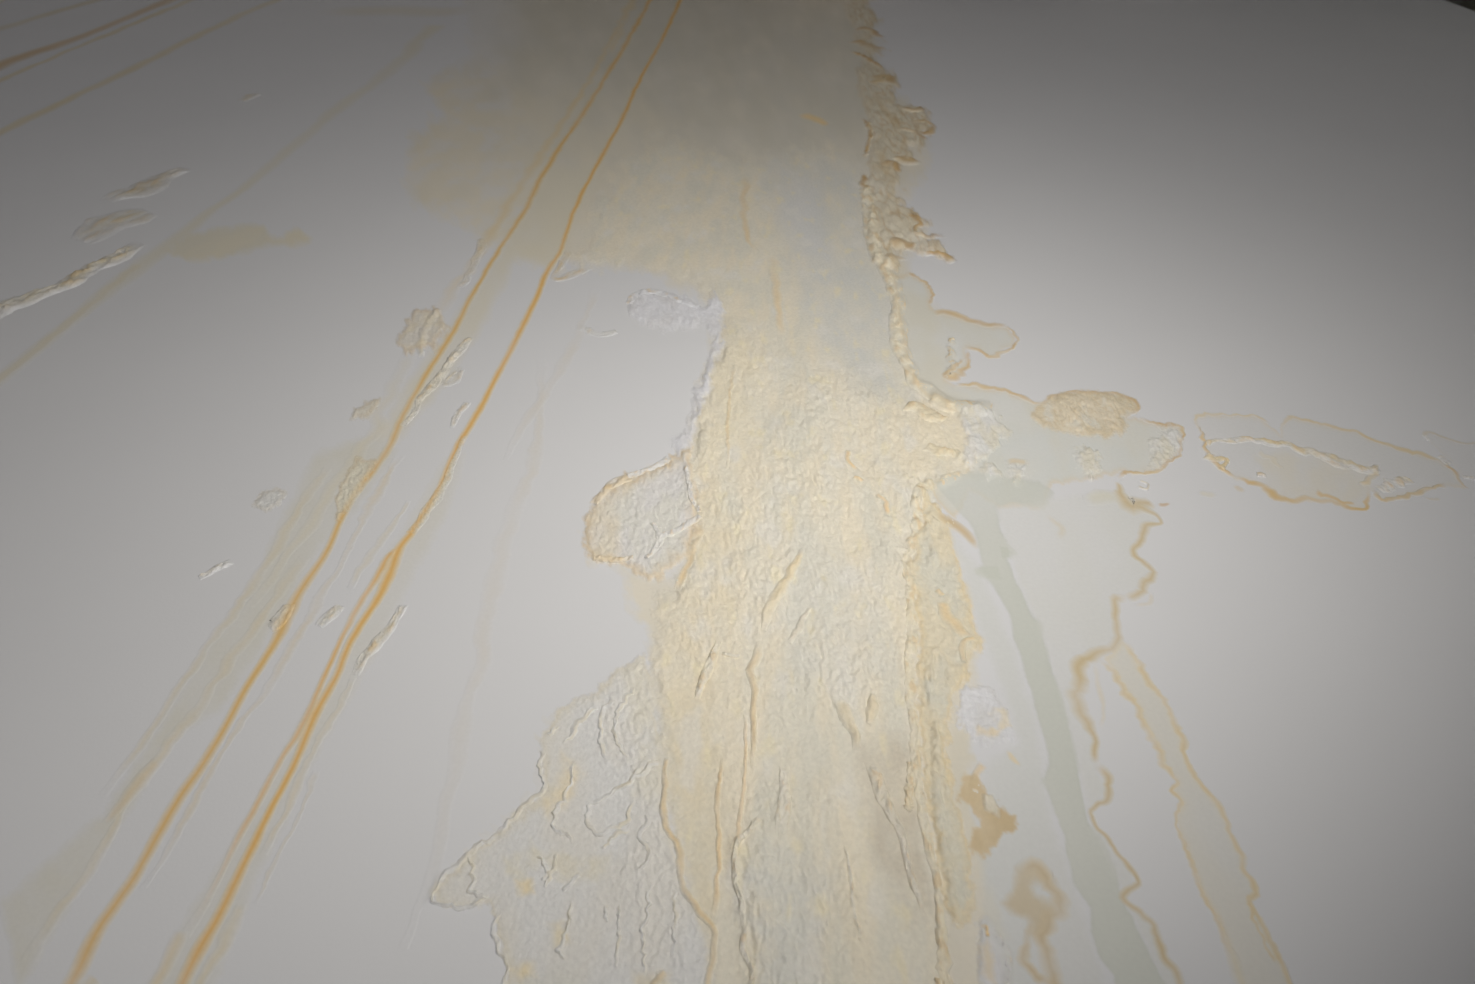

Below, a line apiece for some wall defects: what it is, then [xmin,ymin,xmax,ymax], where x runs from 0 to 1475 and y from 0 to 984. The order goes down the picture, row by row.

peeling [0,242,150,319]
corrosion [0,0,684,984]
water stain [398,0,1475,984]